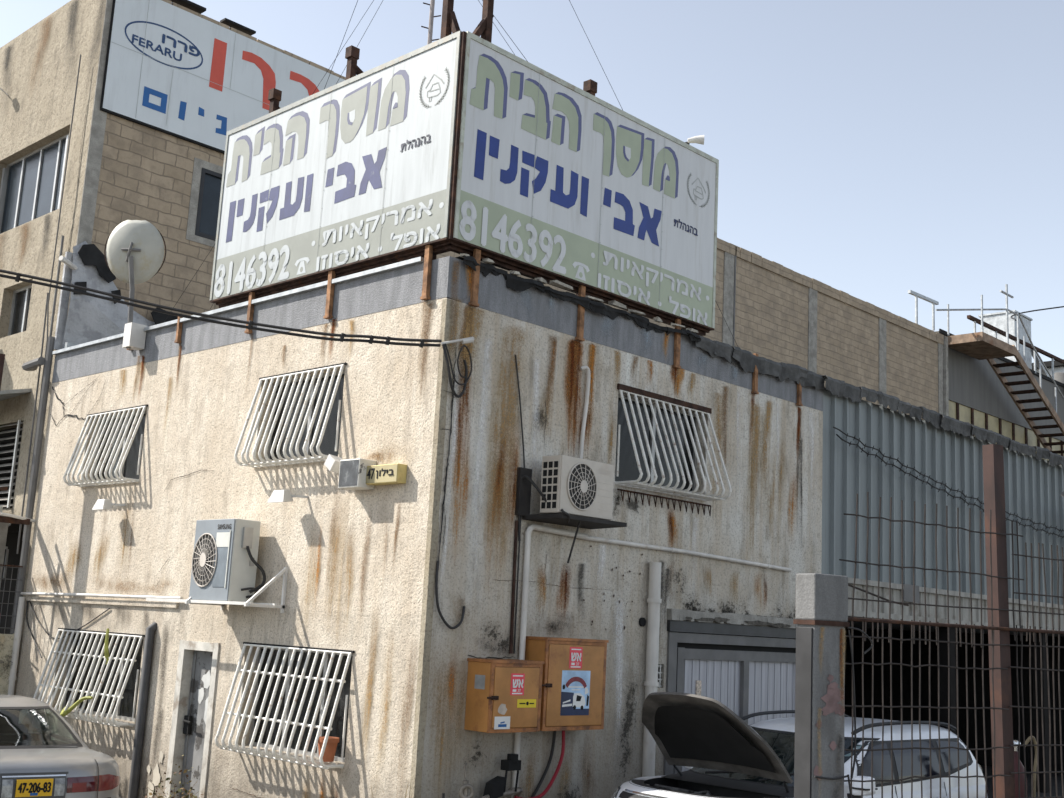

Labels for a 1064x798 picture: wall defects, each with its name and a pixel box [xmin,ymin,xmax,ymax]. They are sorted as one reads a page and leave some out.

crack [50,375,106,426]
corrosion [545,337,595,437]
corrosion [716,387,728,464]
corrosion [750,394,771,488]
water stain [616,611,638,776]
peeling [816,674,845,730]